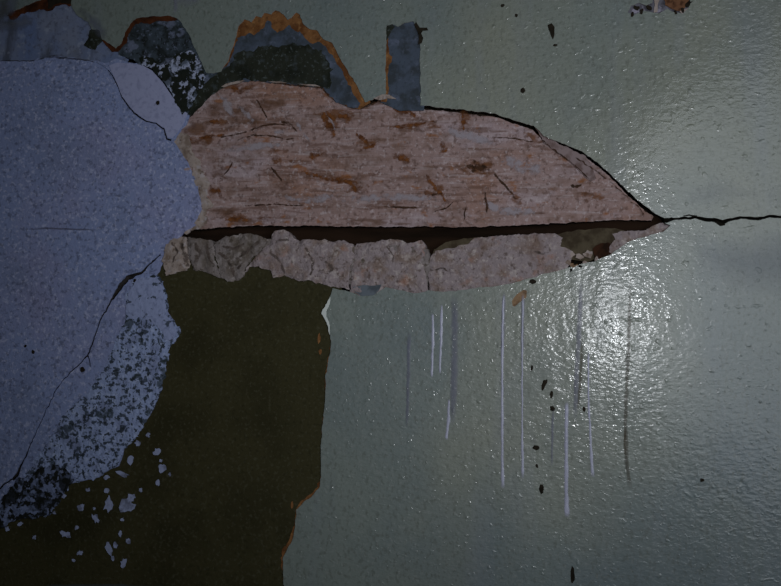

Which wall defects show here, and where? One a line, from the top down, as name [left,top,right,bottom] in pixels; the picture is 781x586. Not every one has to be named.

spalling [628,0,693,17]
crack [6,56,171,141]
spalling [162,22,669,296]
crack [664,214,781,226]
peeling [0,0,371,586]
crack [0,255,161,489]
water stain [431,306,443,376]